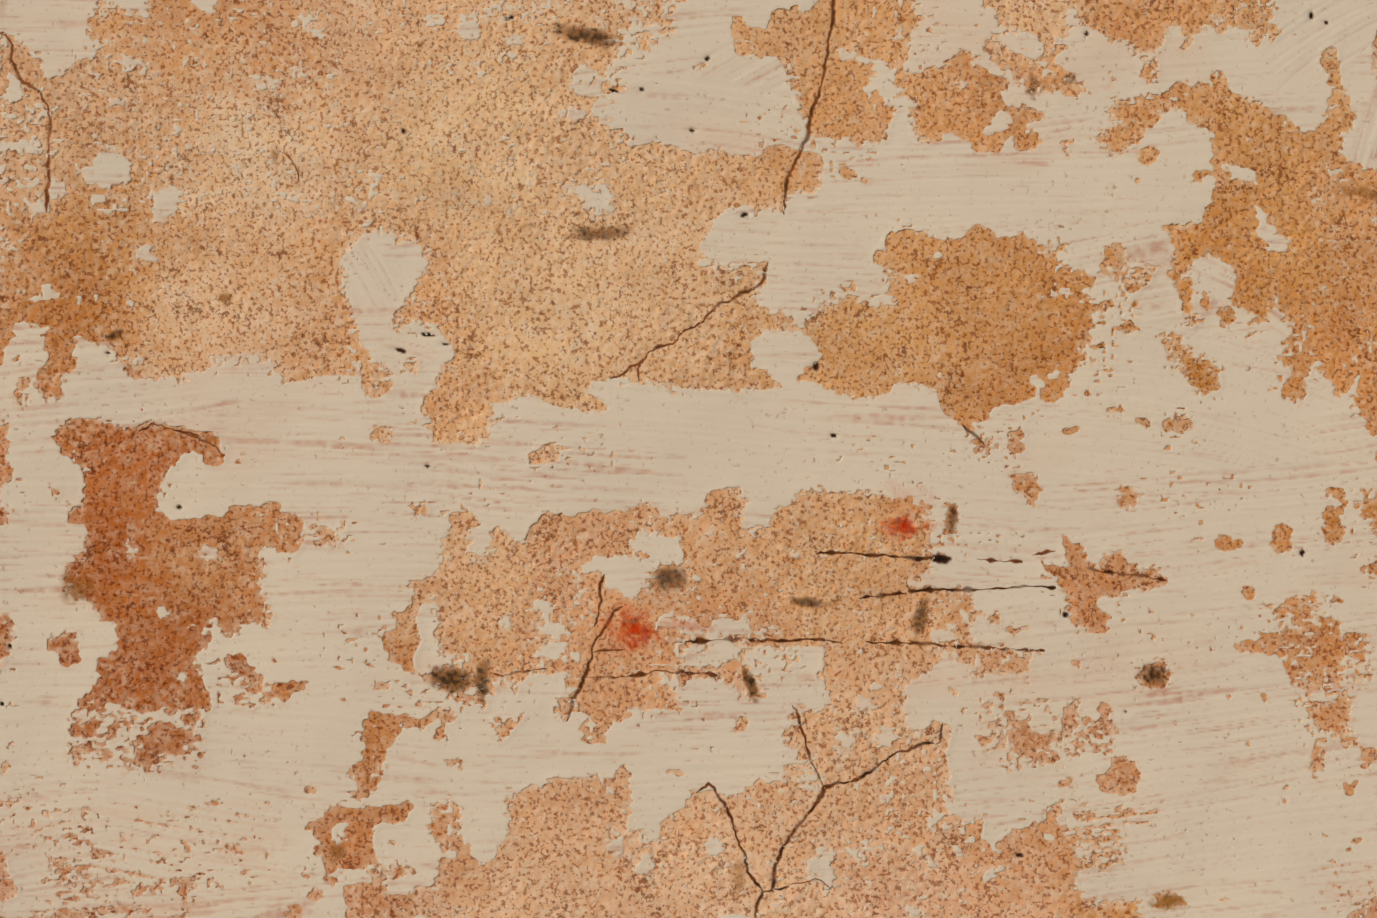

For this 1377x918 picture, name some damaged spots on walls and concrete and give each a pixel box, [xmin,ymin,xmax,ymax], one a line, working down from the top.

crack [0,32,52,212]
crack [783,0,835,215]
peeling [0,0,1377,526]
crack [610,262,768,380]
peeling [1115,466,1258,553]
peeling [0,403,359,918]
crack [566,574,625,722]
peeling [1188,586,1377,796]
crack [696,705,943,918]